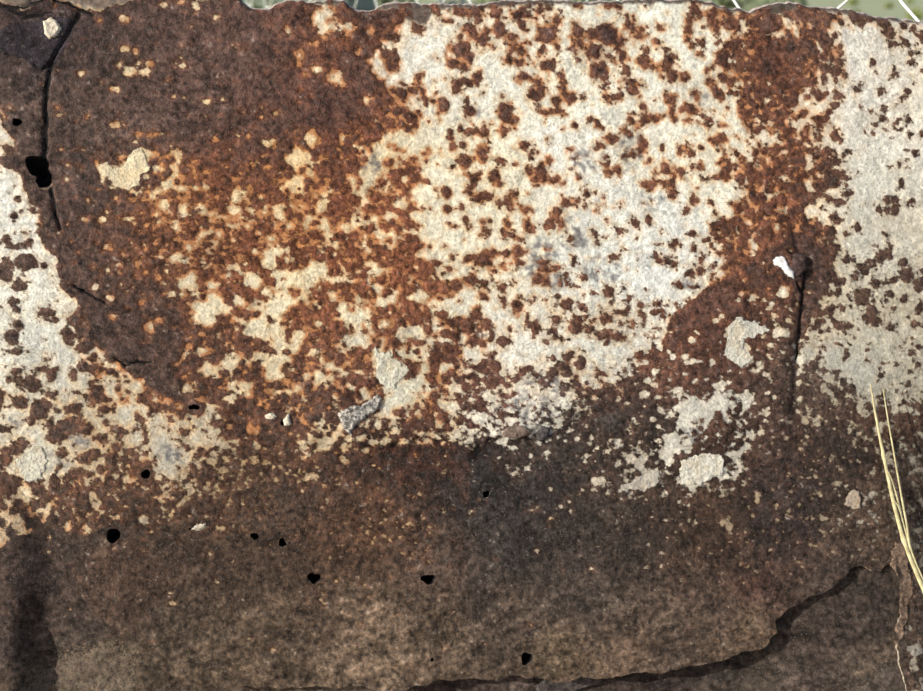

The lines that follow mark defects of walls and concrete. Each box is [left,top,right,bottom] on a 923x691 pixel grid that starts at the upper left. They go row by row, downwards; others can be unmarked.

crack [0,0,93,159]
crack [49,187,61,229]
rust [443,96,534,231]
rust [423,2,690,120]
rust [594,90,720,178]
rust [847,11,923,66]
rust [870,67,923,160]
rust [0,230,47,356]
rust [462,218,528,308]
rust [551,293,650,346]
crack [788,251,807,360]
rust [845,258,923,333]